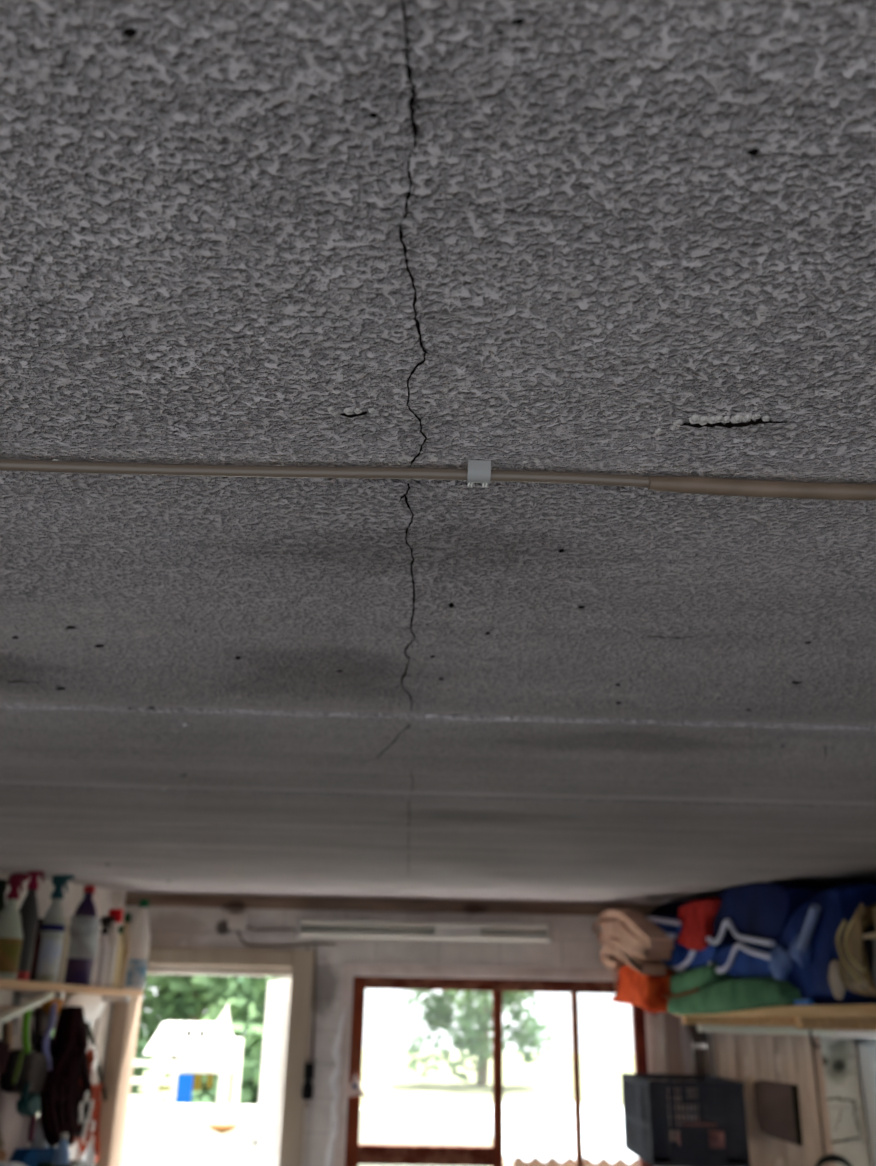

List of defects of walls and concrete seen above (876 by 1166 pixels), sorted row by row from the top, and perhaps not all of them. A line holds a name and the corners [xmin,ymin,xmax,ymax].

crack [376,0,429,759]